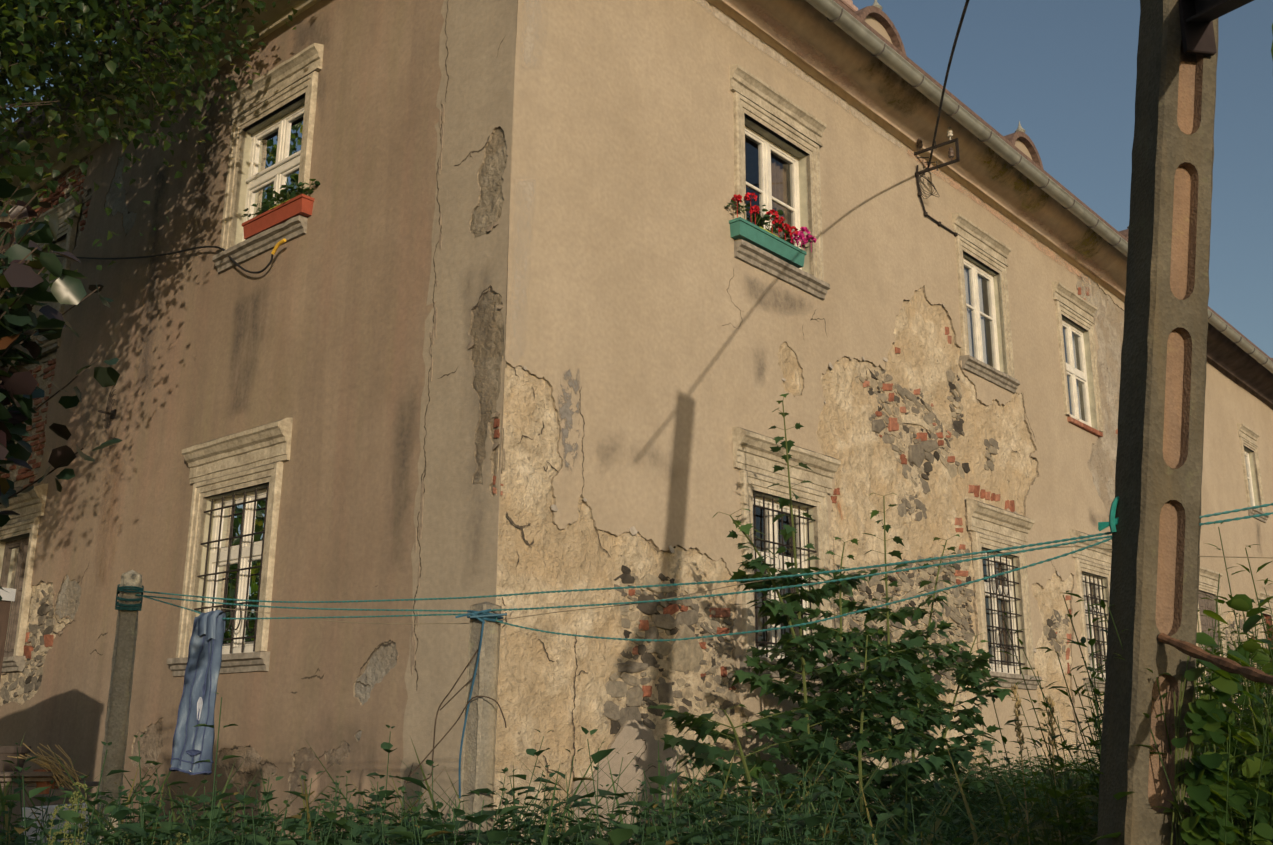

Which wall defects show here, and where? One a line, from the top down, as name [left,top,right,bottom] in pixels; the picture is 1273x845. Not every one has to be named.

spalling [469,126,508,238]
crack [357,1,489,691]
spalling [777,341,804,397]
spalling [467,286,747,845]
spalling [816,285,1039,804]
spalling [0,574,81,706]
crack [291,668,324,694]
spalling [353,640,399,706]
spalling [1031,571,1080,779]